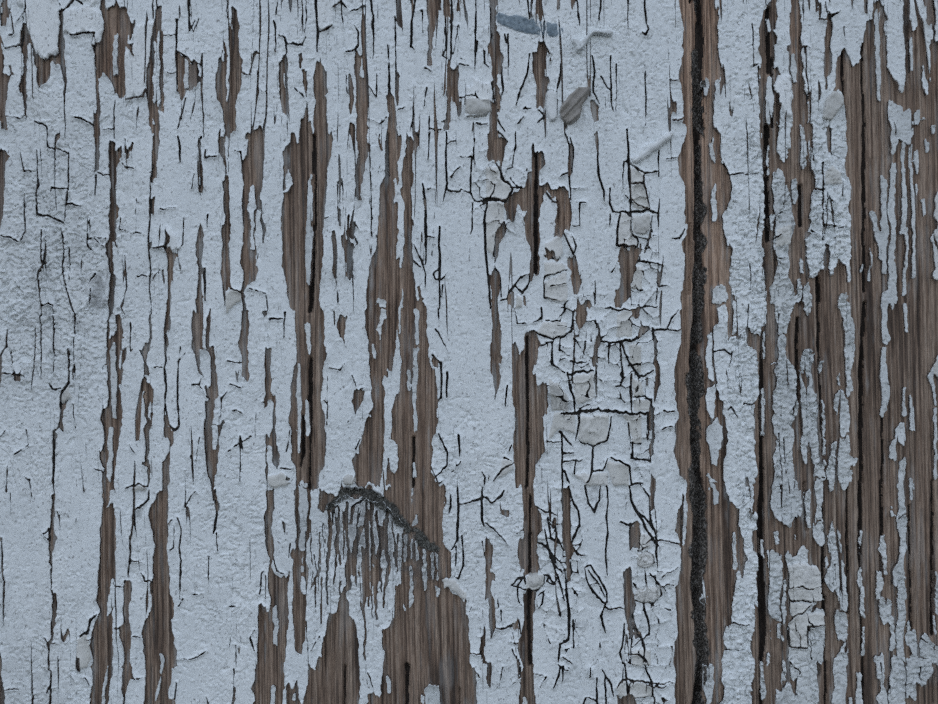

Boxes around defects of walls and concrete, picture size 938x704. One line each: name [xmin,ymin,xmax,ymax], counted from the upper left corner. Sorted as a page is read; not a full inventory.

peeling [0,0,180,704]
crack [2,116,184,409]
crack [153,0,217,192]
crack [170,455,218,606]
crack [155,334,242,431]
peeling [192,225,225,494]
peeling [216,0,267,382]
peeling [252,49,499,704]
crack [273,0,732,704]
peeling [614,244,660,456]
peeling [673,0,870,704]
crack [722,1,934,704]